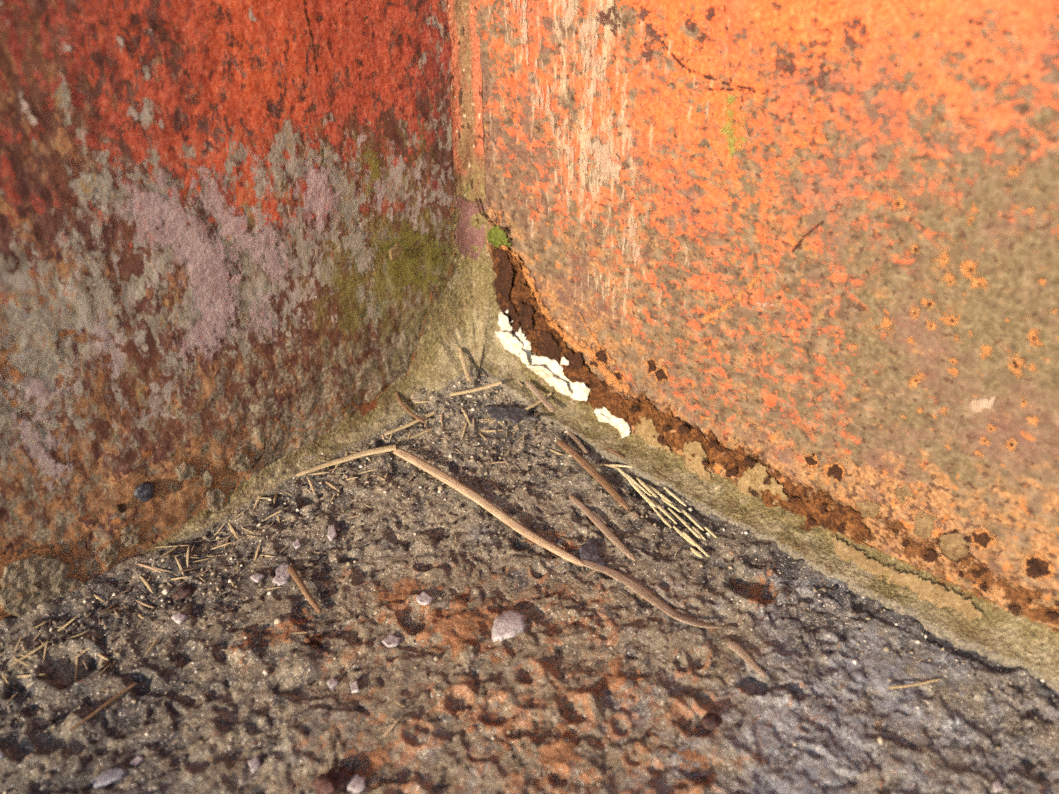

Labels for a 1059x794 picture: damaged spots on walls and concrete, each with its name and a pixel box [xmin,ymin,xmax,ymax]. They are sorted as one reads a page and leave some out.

rust [933,252,987,289]
rust [908,372,925,389]
rust [911,297,971,341]
rust [1007,354,1036,377]
rust [1027,329,1043,348]
rust [0,441,259,617]
rust [515,524,581,579]
rust [609,387,1059,633]
rust [228,608,314,663]
rust [373,563,503,667]